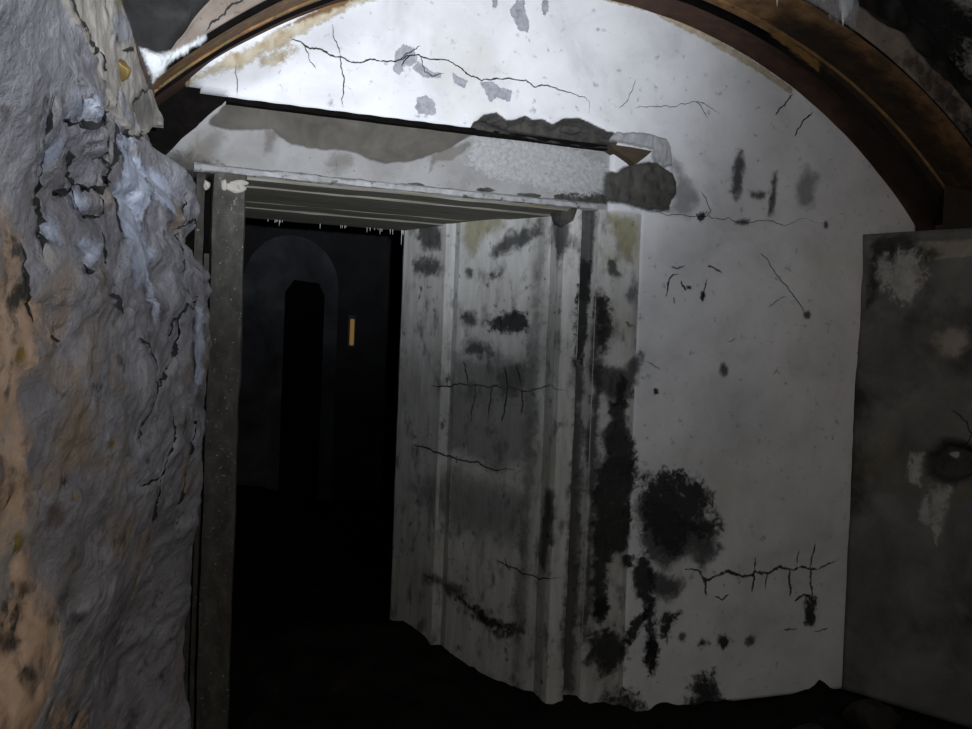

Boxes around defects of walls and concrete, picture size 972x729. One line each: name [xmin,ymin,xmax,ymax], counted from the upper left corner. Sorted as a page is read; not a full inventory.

crack [72,0,135,71]
spalling [393,45,441,78]
crack [290,25,590,109]
spalling [510,0,529,32]
spalling [415,96,436,115]
spalling [471,82,617,148]
damp [210,105,610,197]
crack [21,80,149,347]
damp [493,220,540,257]
damp [462,310,529,333]
damp [563,210,724,711]
crack [685,543,839,632]